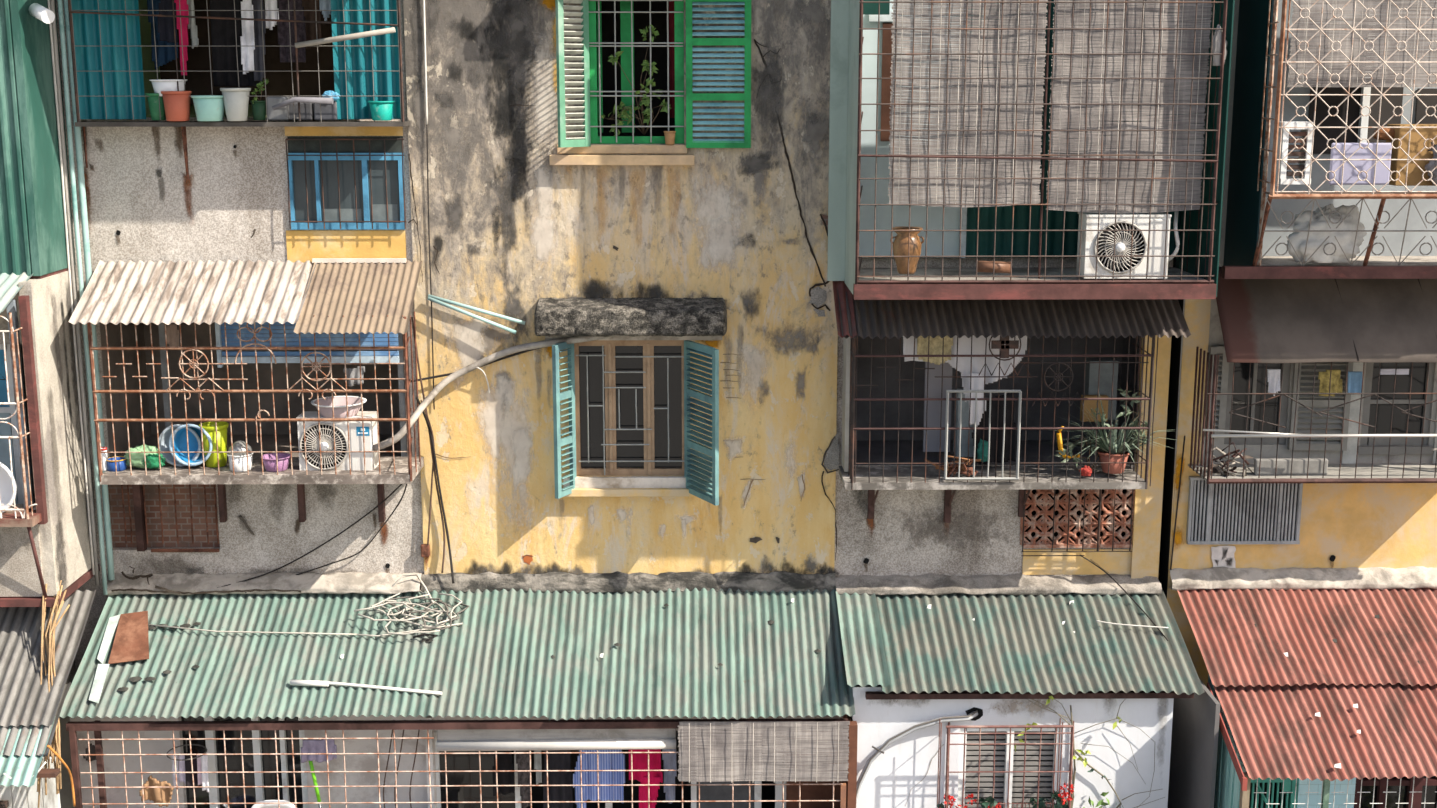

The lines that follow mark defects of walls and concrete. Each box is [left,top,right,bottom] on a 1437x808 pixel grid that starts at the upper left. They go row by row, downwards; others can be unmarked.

rust [183,175,191,215]
leakage [412,0,536,355]
leakage [563,279,672,299]
peeling [454,319,486,384]
peeling [478,377,532,520]
leakage [904,510,992,551]
leakage [468,561,584,576]
leakage [742,558,839,575]